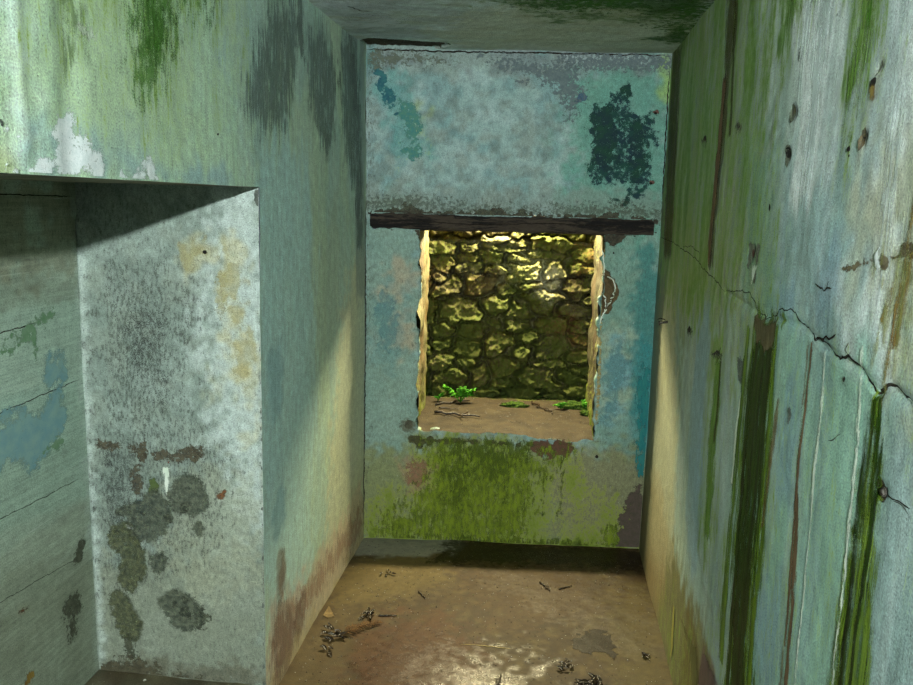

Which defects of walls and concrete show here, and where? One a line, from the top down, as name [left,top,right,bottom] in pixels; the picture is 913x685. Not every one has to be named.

peeling [5,108,105,176]
peeling [119,155,159,180]
leakage [240,0,461,250]
leakage [476,46,682,267]
crack [366,48,913,401]
crack [0,381,75,414]
crack [0,479,78,519]
leakage [95,438,205,534]
leakage [426,484,644,571]
leakage [719,317,778,685]
corrosion [779,343,813,685]
leakage [832,347,884,685]